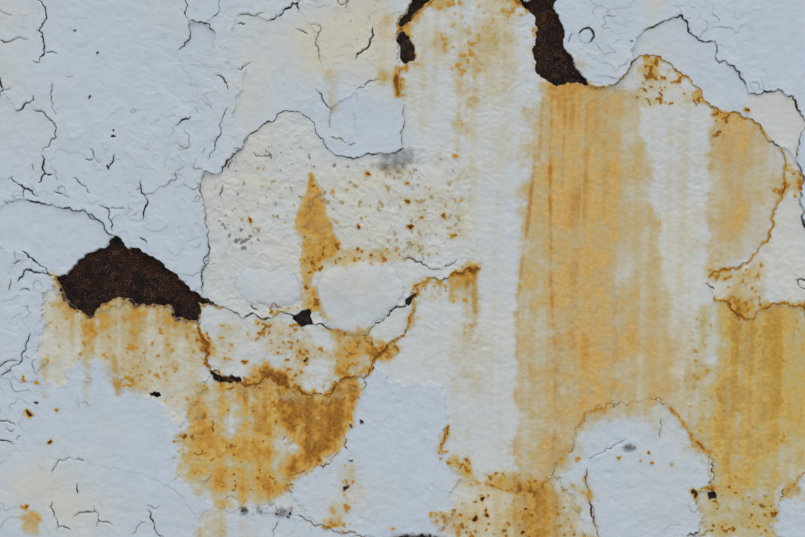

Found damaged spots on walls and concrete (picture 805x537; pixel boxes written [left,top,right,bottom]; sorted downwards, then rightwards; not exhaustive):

crack [38,0,57,63]
crack [238,2,299,25]
crack [356,27,374,58]
peeling [0,91,57,185]
crack [8,84,62,197]
crack [9,251,53,290]
peeling [0,198,115,276]
peeling [35,0,559,537]
corrosion [379,0,805,537]
peeling [604,14,805,439]
corrosion [49,164,481,536]
peeling [687,447,805,537]